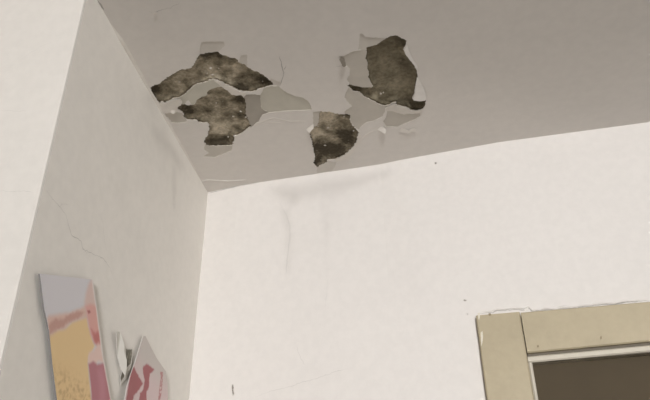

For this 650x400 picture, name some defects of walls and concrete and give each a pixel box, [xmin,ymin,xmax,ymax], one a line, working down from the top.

spalling [151,33,426,174]